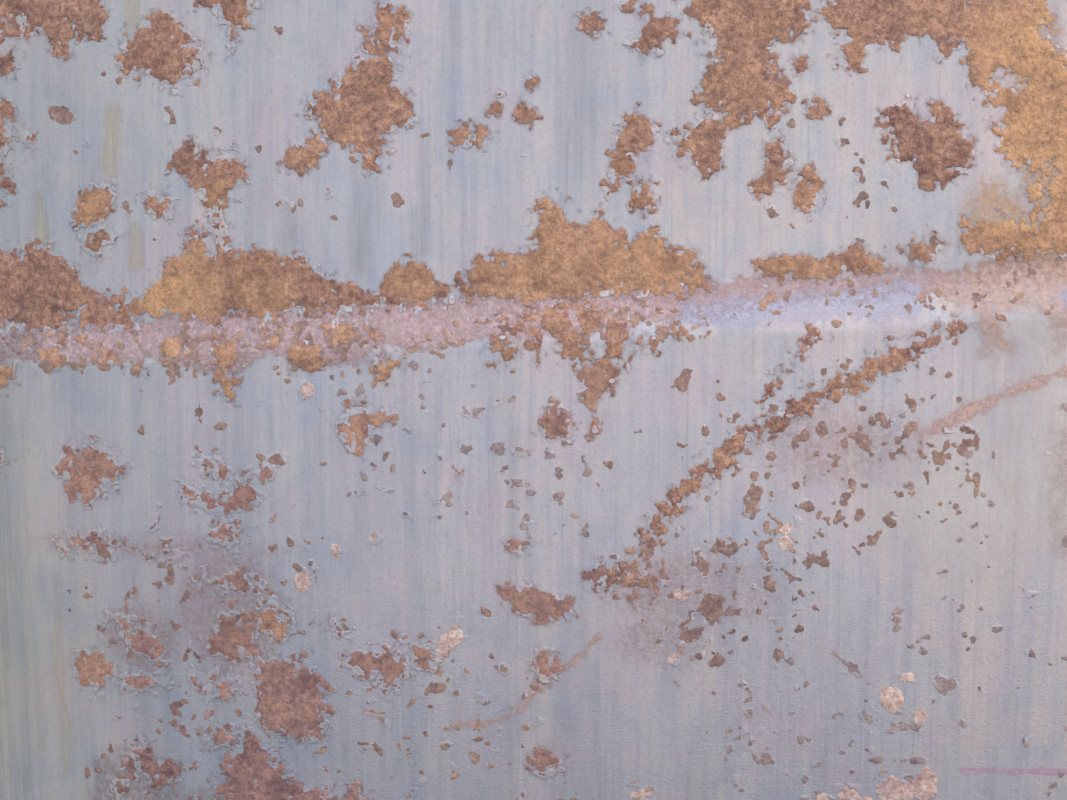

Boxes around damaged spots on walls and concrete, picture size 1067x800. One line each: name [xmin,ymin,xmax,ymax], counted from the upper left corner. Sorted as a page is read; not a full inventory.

rust [0,0,1067,457]
spalling [158,320,380,424]
spalling [402,311,535,414]
rust [51,434,134,510]
spalling [490,441,536,530]
spalling [579,271,996,668]
rust [67,609,175,697]
rust [145,449,377,800]
rust [328,613,443,696]
rust [496,581,579,625]
peeling [830,650,959,734]
peeling [799,747,938,800]